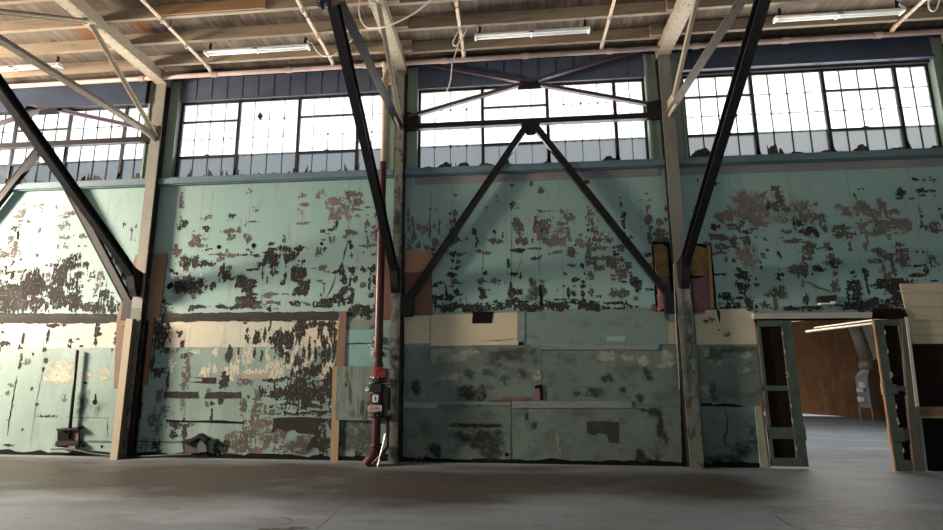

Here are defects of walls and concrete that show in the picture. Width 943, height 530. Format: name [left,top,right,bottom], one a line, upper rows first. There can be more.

spalling [639,192,673,292]
peeling [690,176,943,314]
peeling [139,187,377,456]